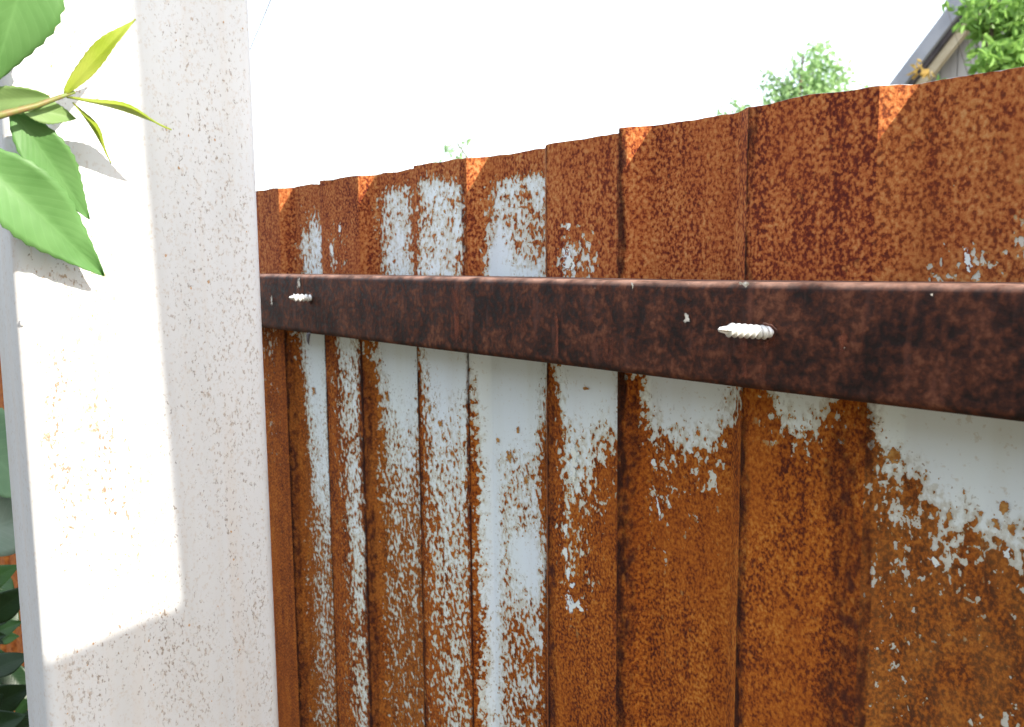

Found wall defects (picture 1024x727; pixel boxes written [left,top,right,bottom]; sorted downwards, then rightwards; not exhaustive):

corrosion [246,67,1024,282]
corrosion [262,327,1024,727]